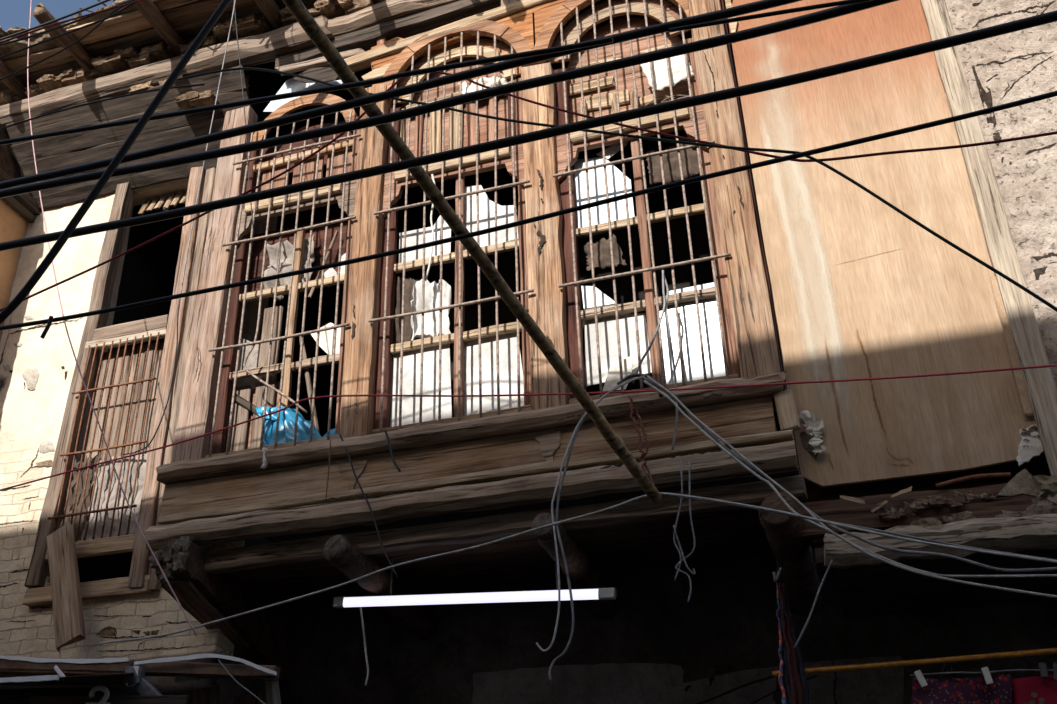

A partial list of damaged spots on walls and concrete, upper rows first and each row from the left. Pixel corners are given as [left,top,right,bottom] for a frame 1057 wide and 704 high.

crack [972,0,1056,29]
crack [974,51,1053,98]